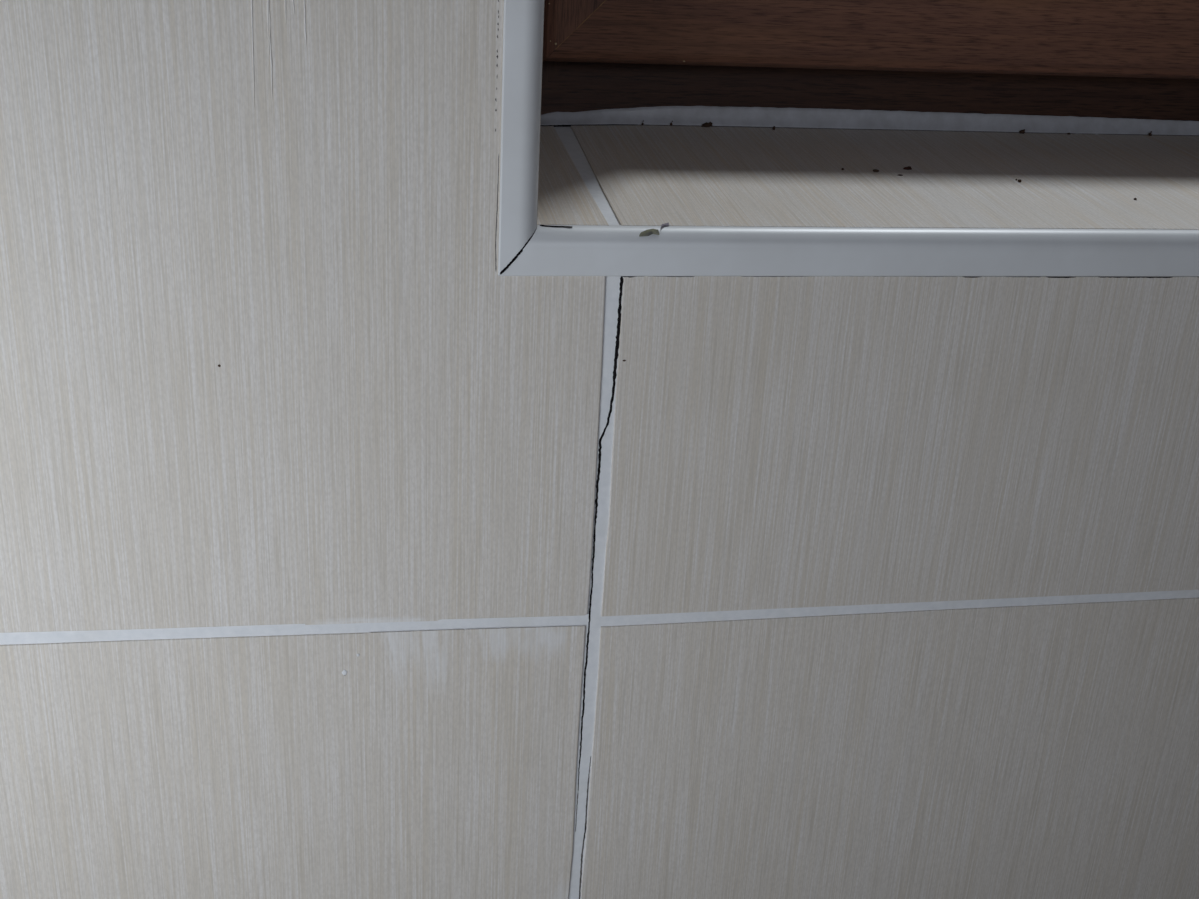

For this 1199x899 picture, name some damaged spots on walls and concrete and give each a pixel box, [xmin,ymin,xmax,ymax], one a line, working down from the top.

crack [575,276,695,899]